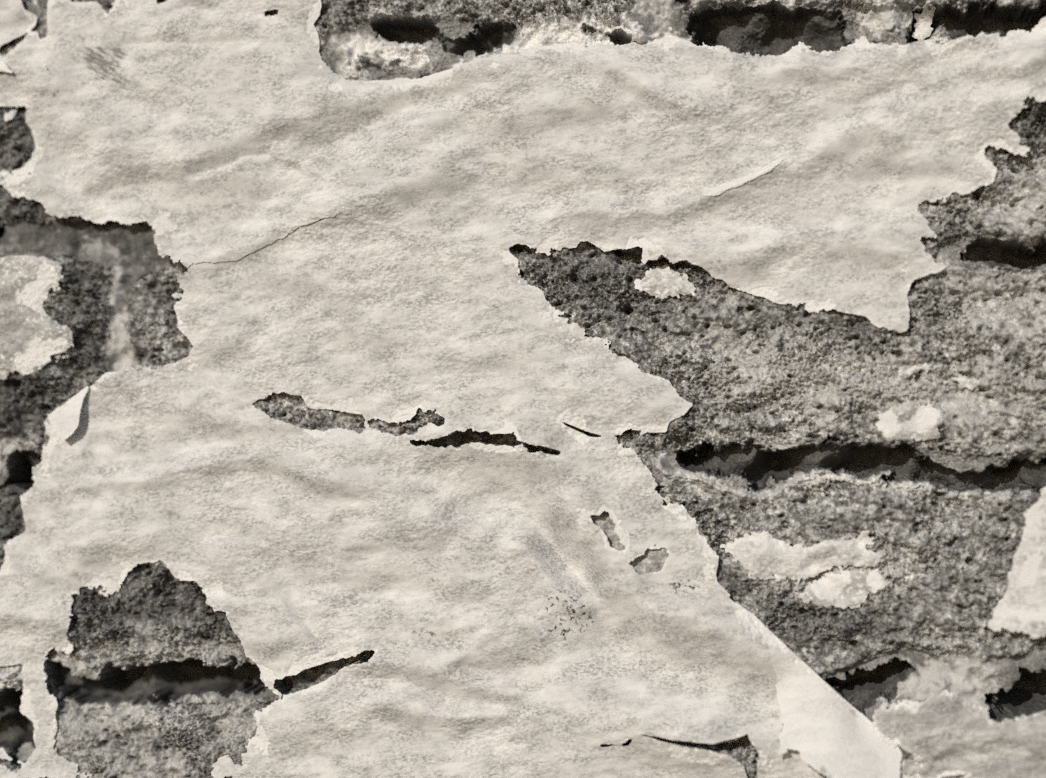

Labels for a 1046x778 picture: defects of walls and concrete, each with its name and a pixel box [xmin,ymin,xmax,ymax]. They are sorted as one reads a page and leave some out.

spalling [0,0,48,57]
spalling [71,0,115,14]
spalling [314,0,630,70]
spalling [677,0,1041,41]
spalling [0,106,112,227]
spalling [0,255,116,452]
spalling [124,261,193,372]
spalling [509,96,1046,676]
spalling [0,487,26,569]
spalling [0,664,23,692]
spalling [44,560,289,778]
spalling [0,743,36,778]